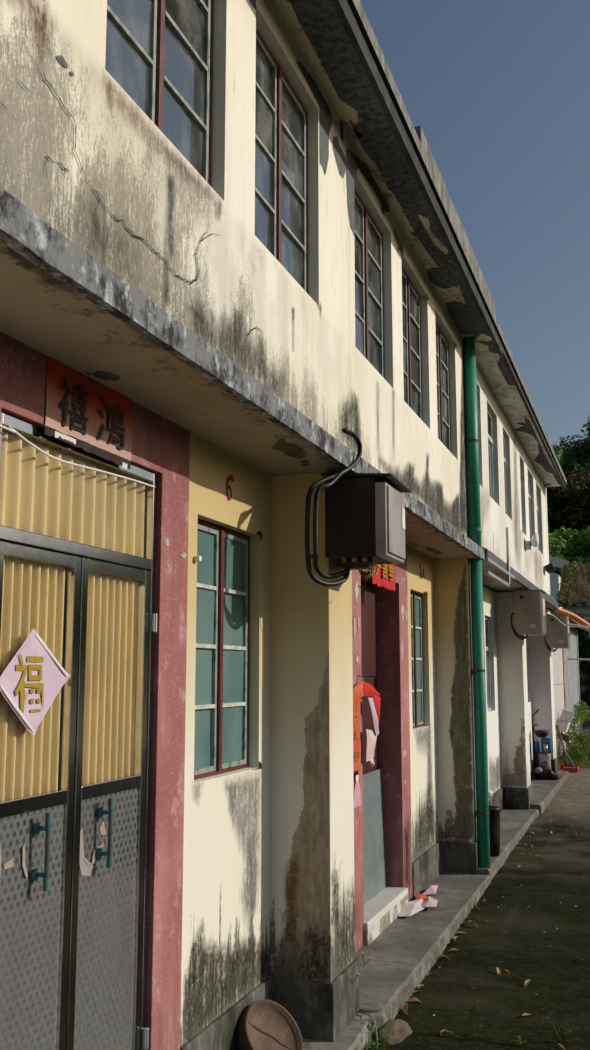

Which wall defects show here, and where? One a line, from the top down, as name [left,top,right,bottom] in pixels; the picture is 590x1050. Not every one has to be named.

crack [20,72,221,323]
peeling [287,0,515,386]
water stain [386,353,466,531]
water stain [185,652,355,1039]
water stain [405,567,474,885]